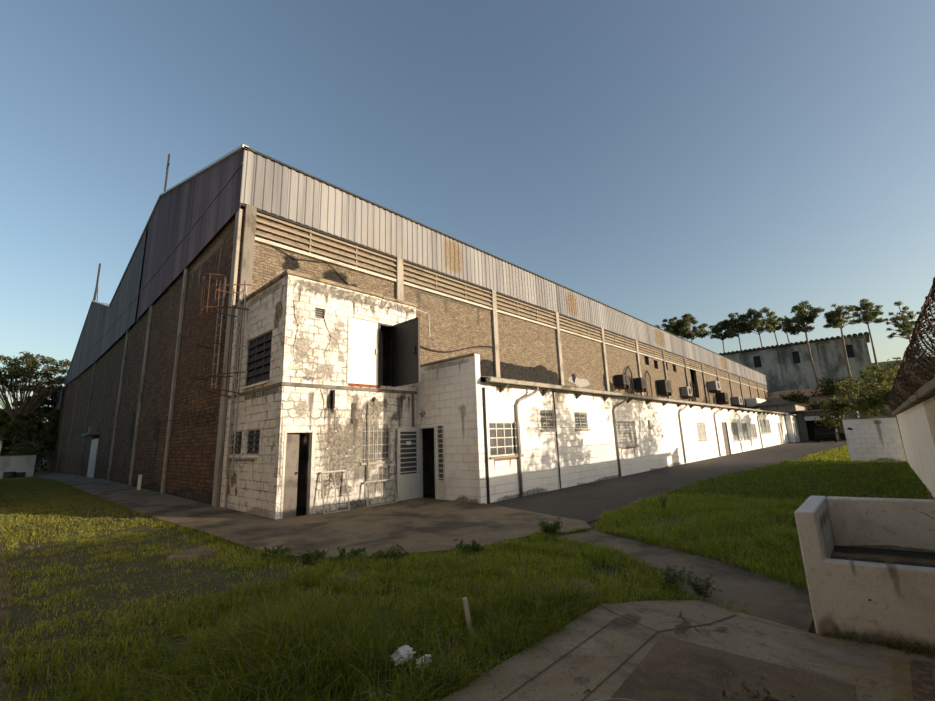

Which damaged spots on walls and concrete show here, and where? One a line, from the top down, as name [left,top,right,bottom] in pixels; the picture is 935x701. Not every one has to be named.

peeling [274,297,283,329]
peeling [291,317,345,382]
peeling [318,392,401,498]